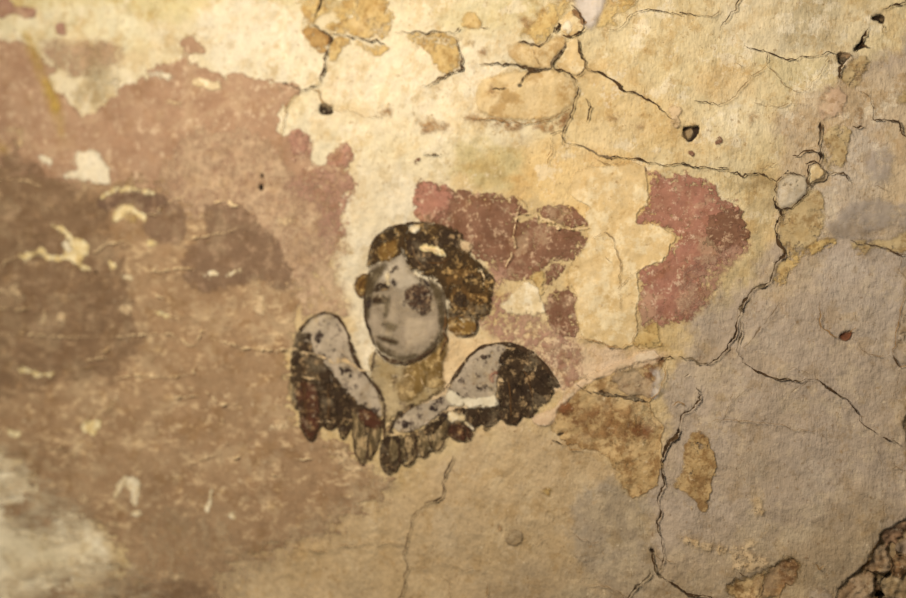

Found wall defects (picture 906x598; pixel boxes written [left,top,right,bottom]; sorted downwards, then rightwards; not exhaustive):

peeling [300,0,394,61]
peeling [407,32,460,73]
peeling [461,12,481,29]
peeling [520,0,569,44]
peeling [113,204,147,223]
peeling [412,181,454,222]
peeling [19,225,90,271]
crack [280,0,906,598]
flaking render [550,360,664,499]
peeling [673,431,717,512]
flaking render [725,558,801,598]
flaking render [837,521,906,598]